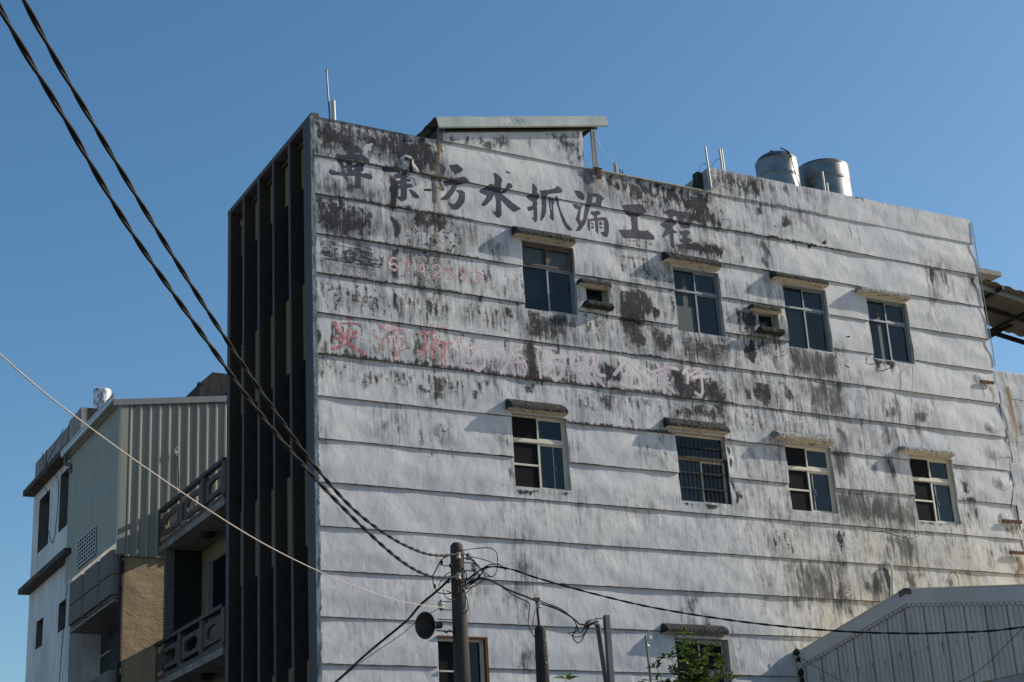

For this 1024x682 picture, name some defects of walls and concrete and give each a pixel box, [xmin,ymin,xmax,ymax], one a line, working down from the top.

mould [553,132,582,161]
leakage [315,120,511,315]
leakage [325,313,734,425]
leakage [838,494,957,526]
leakage [796,564,846,608]
leakage [866,568,891,597]
leakage [886,538,922,583]